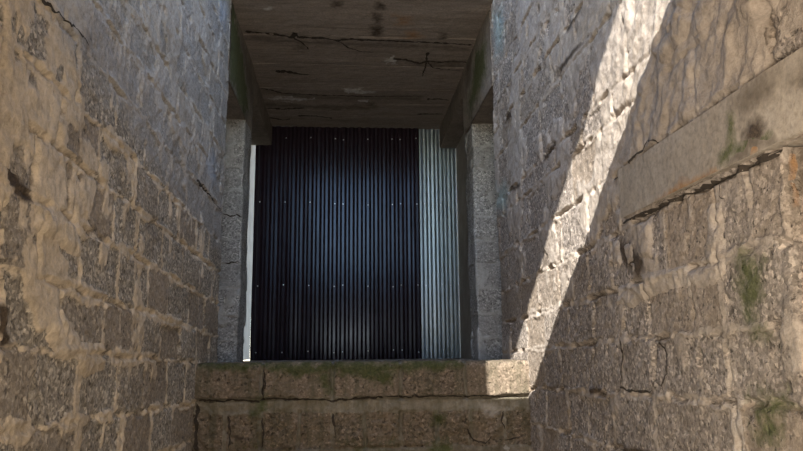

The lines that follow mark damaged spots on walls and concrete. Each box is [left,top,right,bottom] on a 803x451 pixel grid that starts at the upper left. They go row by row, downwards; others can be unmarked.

crack [245,31,471,76]
crack [261,70,403,120]